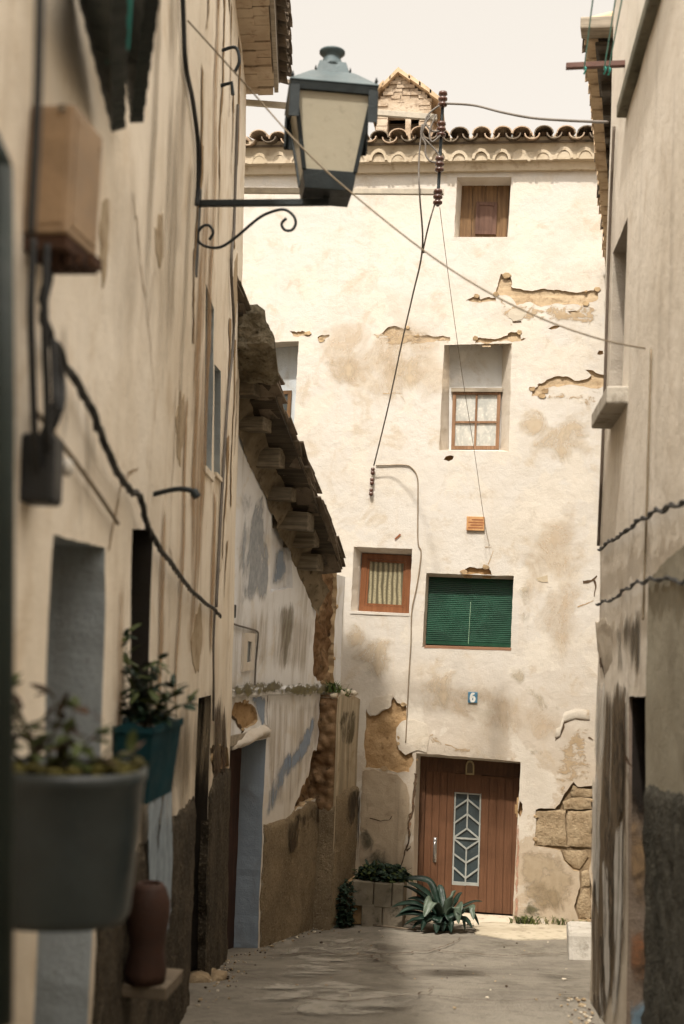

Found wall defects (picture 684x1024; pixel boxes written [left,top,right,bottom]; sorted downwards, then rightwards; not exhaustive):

spalling [466,272,601,314]
spalling [382,326,450,344]
spalling [472,330,525,347]
spalling [529,370,604,399]
spalling [460,564,495,579]
spalling [232,699,258,731]
spalling [364,697,418,773]
spalling [515,782,593,922]